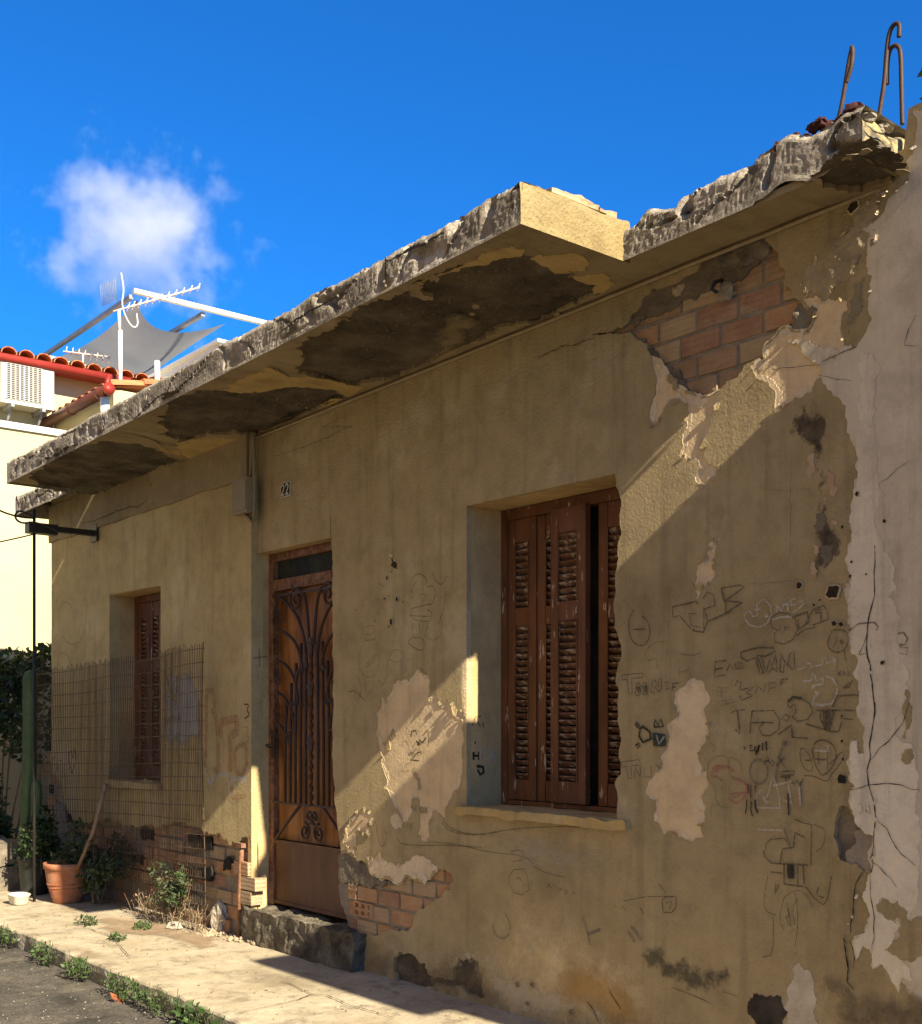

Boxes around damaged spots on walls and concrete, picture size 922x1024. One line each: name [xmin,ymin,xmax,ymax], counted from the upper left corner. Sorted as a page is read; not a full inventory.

spalling [33,246,615,495]
flaking render [614,21,922,1002]
damp [793,410,840,578]
peeling [376,668,468,842]
crack [840,545,916,988]
flaking render [338,807,453,935]
flaking render [396,953,485,998]
damp [643,950,729,987]